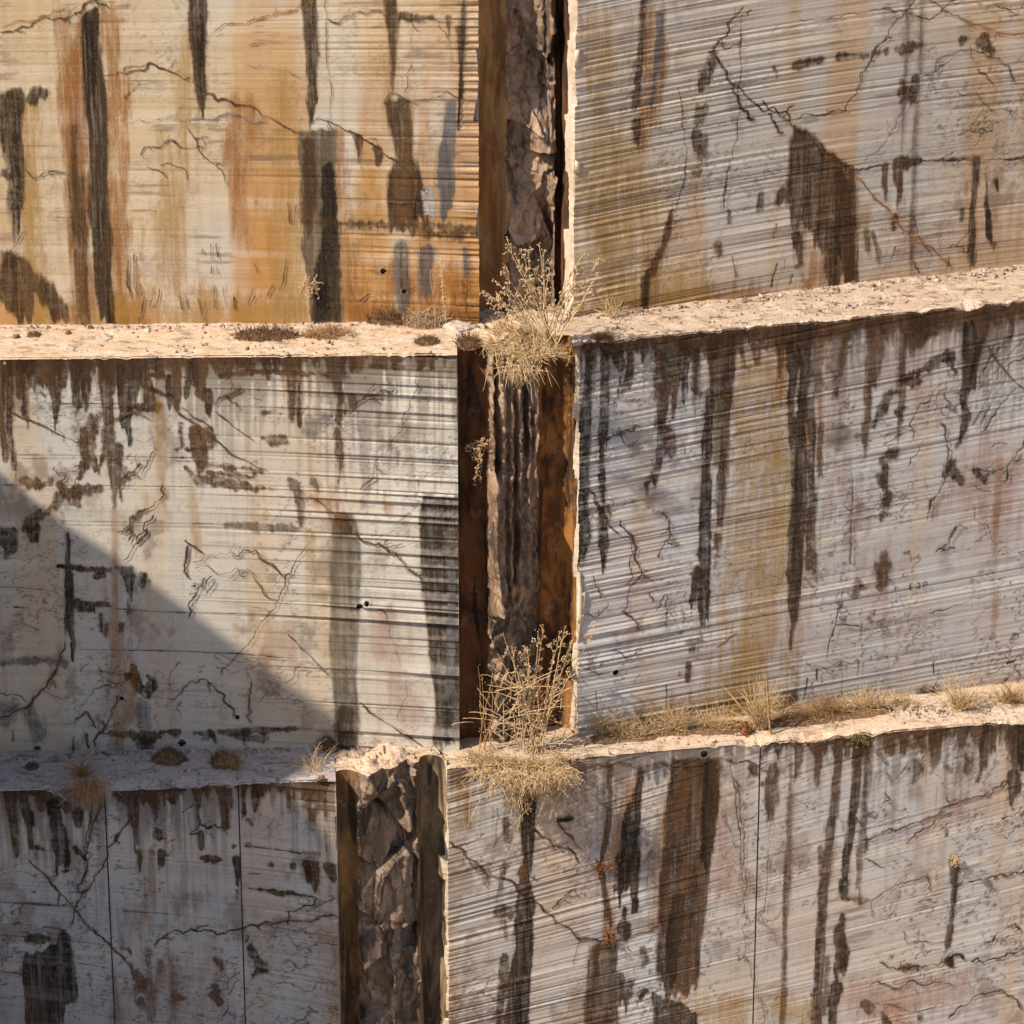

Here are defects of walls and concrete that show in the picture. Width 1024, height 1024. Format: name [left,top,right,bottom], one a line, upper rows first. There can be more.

damp [0,7,115,325]
rust [60,22,89,257]
rust [101,6,152,325]
crack [104,0,462,194]
crack [709,0,1024,274]
damp [0,353,446,559]
crack [168,540,332,724]
crack [578,489,680,682]
damp [577,301,1024,683]
damp [584,757,721,1024]
damp [748,723,1024,1024]
crack [869,917,1024,1019]